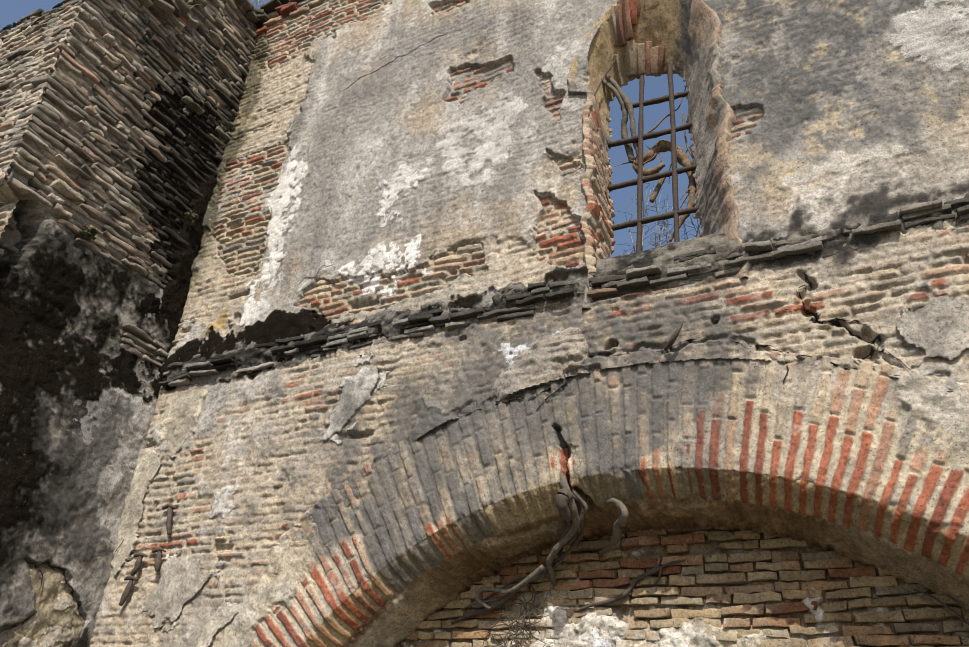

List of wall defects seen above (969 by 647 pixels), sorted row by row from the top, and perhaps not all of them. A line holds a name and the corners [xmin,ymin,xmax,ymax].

flaking render [444,58,514,105]
damp [885,0,969,90]
damp [782,145,909,186]
damp [159,142,382,391]
flaking render [530,196,592,270]
damp [739,179,969,266]
crack [656,272,911,384]
peeling [896,295,969,368]
peeling [322,352,390,446]
crack [495,378,568,411]
damp [45,368,148,573]